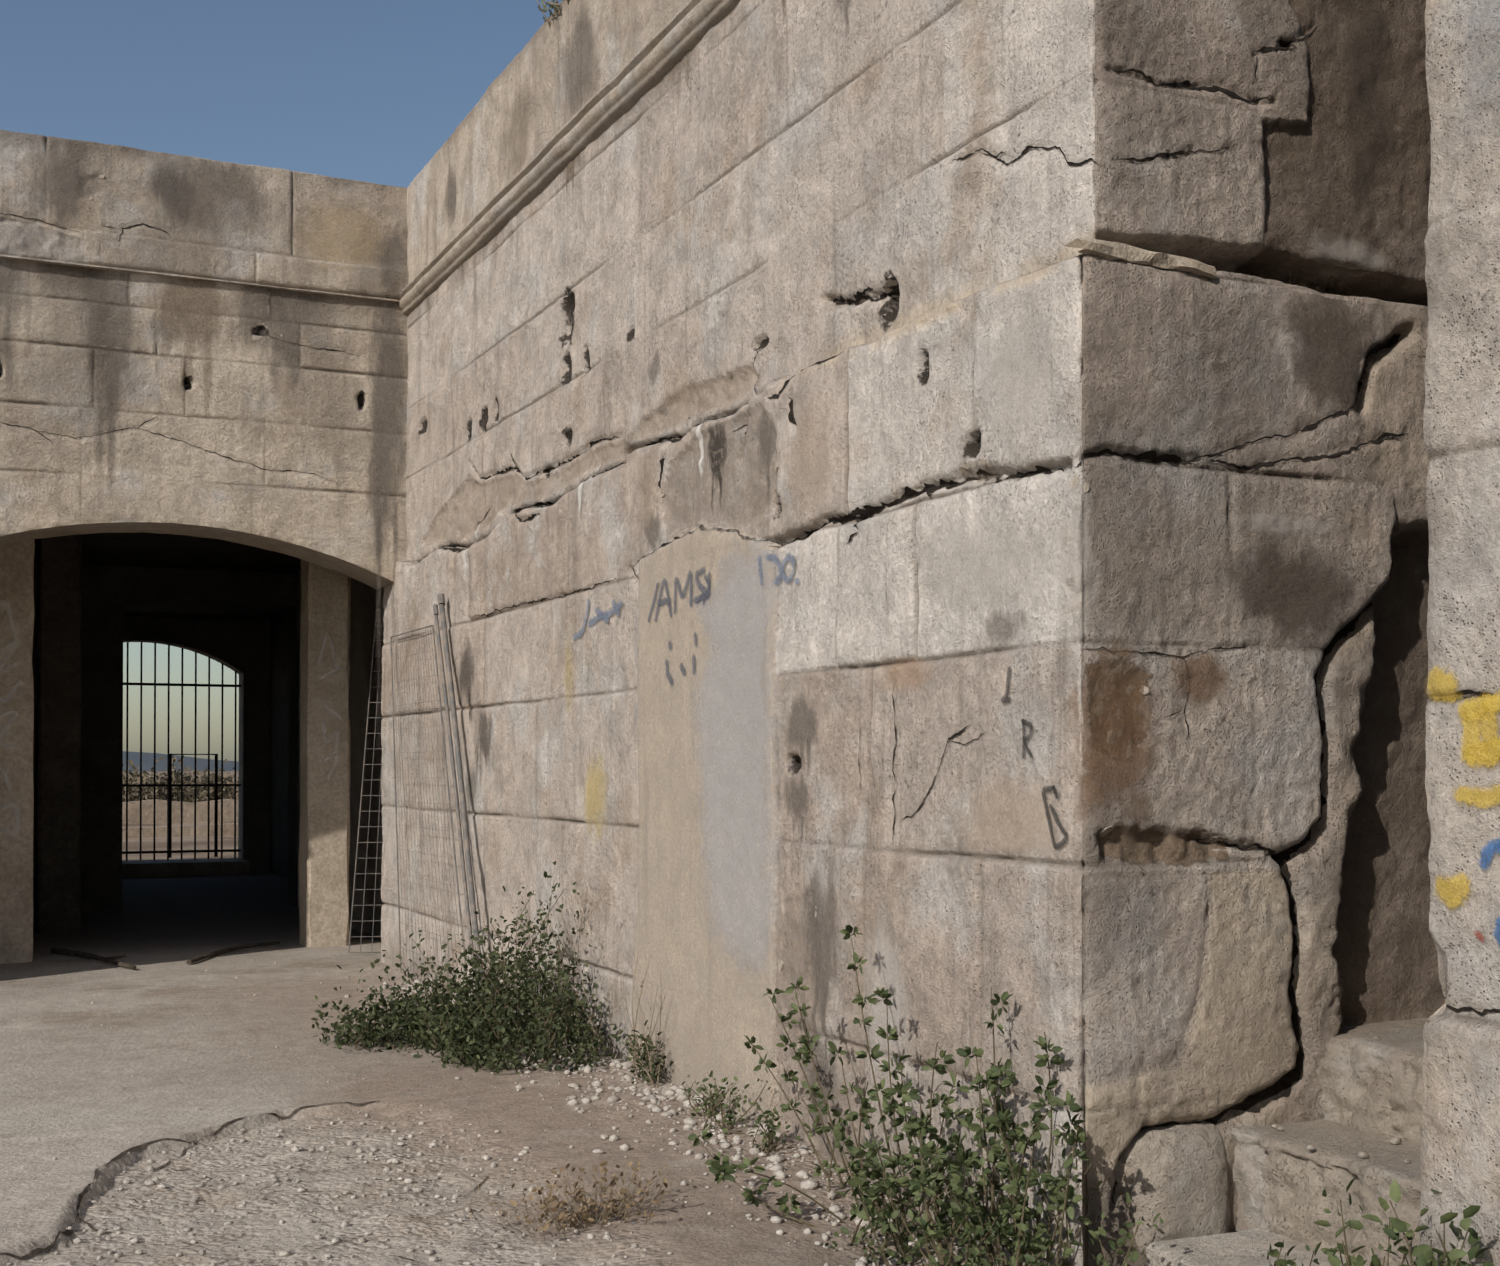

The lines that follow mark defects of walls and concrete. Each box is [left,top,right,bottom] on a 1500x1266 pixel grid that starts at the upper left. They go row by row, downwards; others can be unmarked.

crack [1111,25,1319,104]
crack [953,145,1235,166]
crack [0,213,171,240]
crack [416,334,1408,617]
water stain [1232,516,1348,635]
water stain [789,700,814,765]
crack [858,689,986,866]
crack [1088,601,1373,1204]